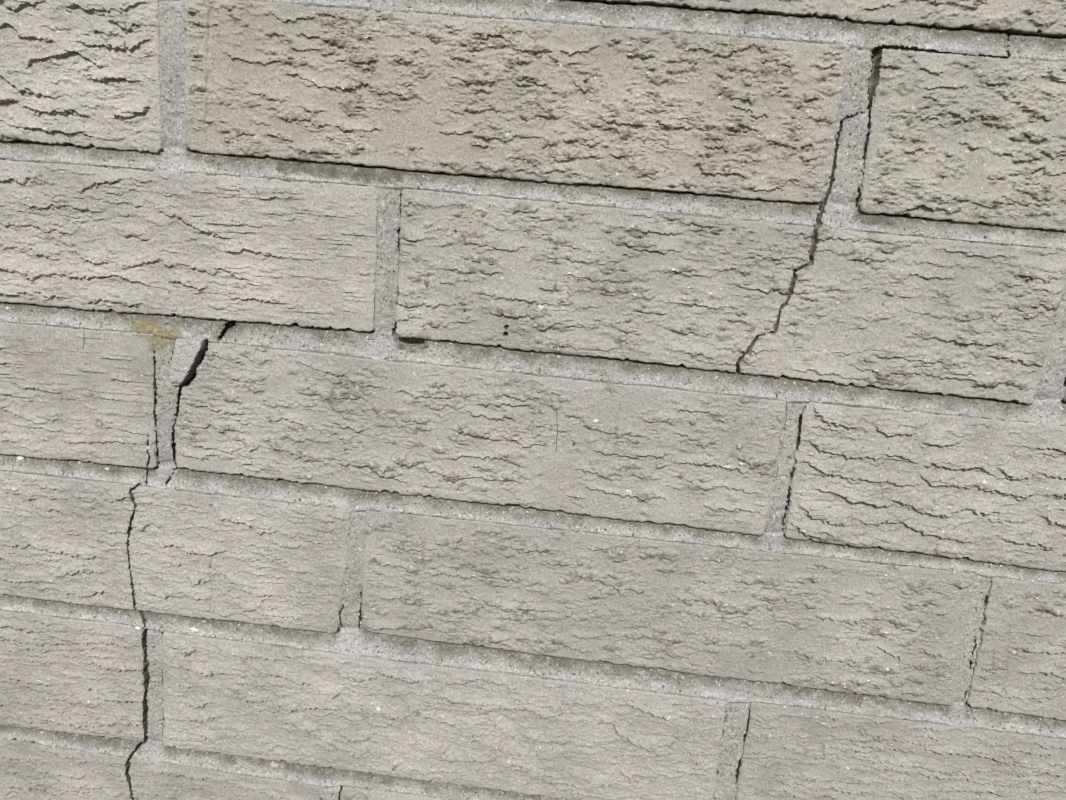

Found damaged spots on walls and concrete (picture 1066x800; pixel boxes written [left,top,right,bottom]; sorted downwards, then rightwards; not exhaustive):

crack [736,36,1010,372]
crack [125,321,236,800]